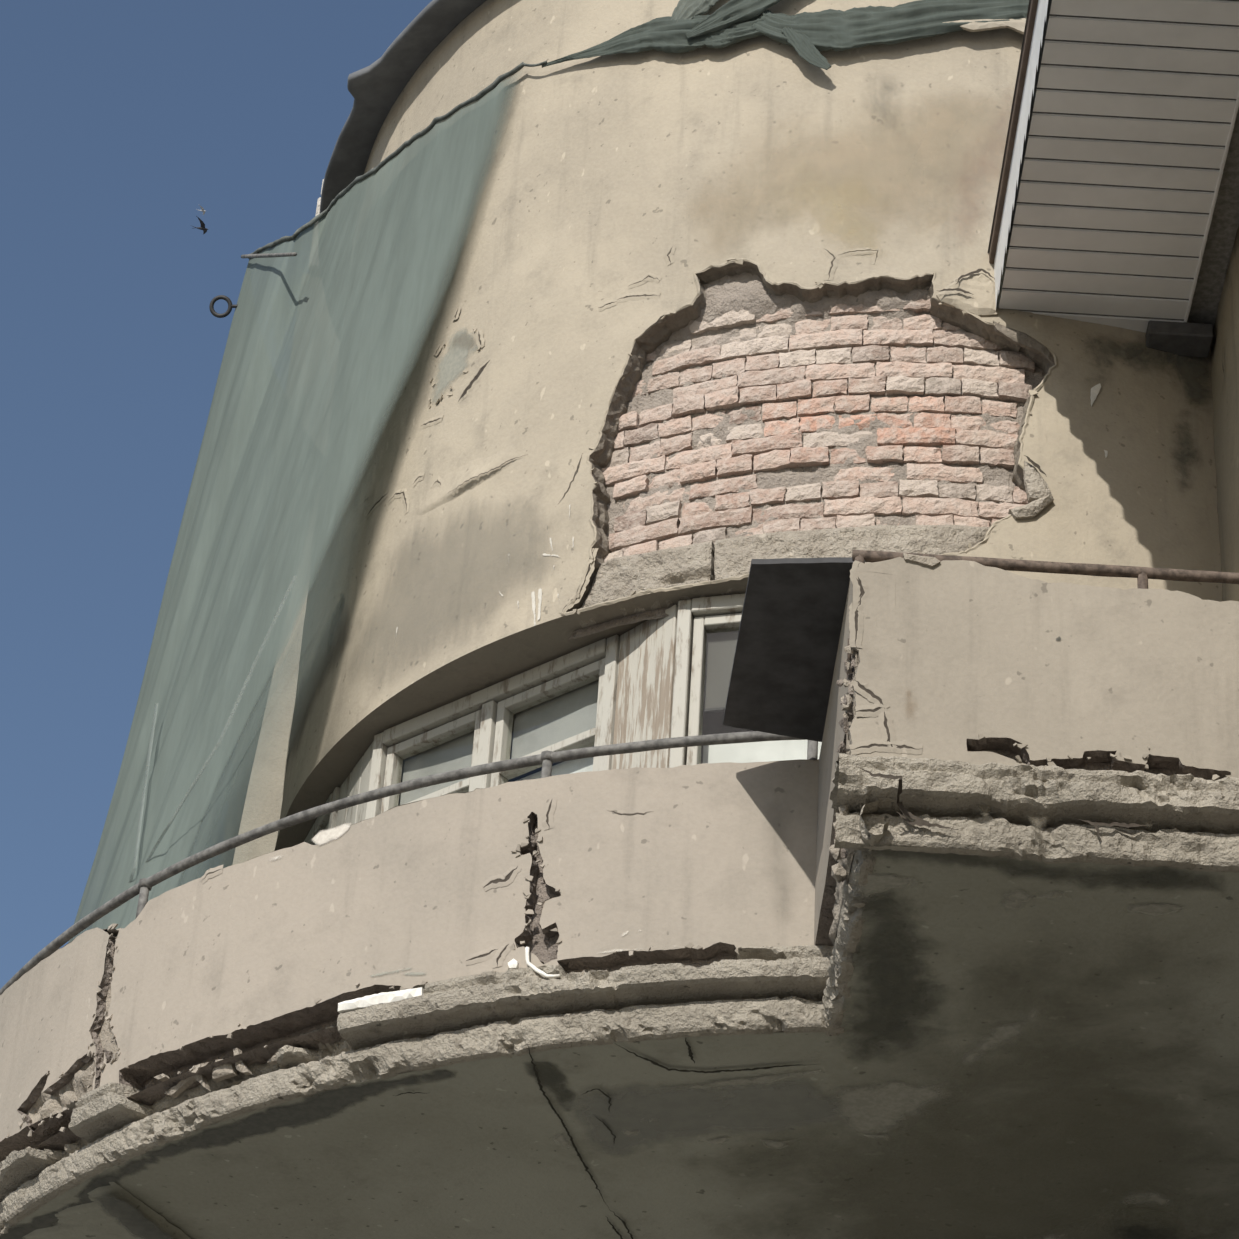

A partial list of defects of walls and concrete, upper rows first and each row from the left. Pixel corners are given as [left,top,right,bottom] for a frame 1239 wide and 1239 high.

peeling [428,307,485,409]
flaking render [561,258,1058,639]
spalling [836,632,860,755]
crack [849,560,958,830]
flaking render [966,734,1234,781]
spalling [0,924,406,1162]
spalling [510,812,742,974]
crack [615,1038,815,1073]
spalling [815,803,875,946]
leakage [853,874,933,1053]
leakage [868,847,1214,889]
crack [525,1040,633,1239]